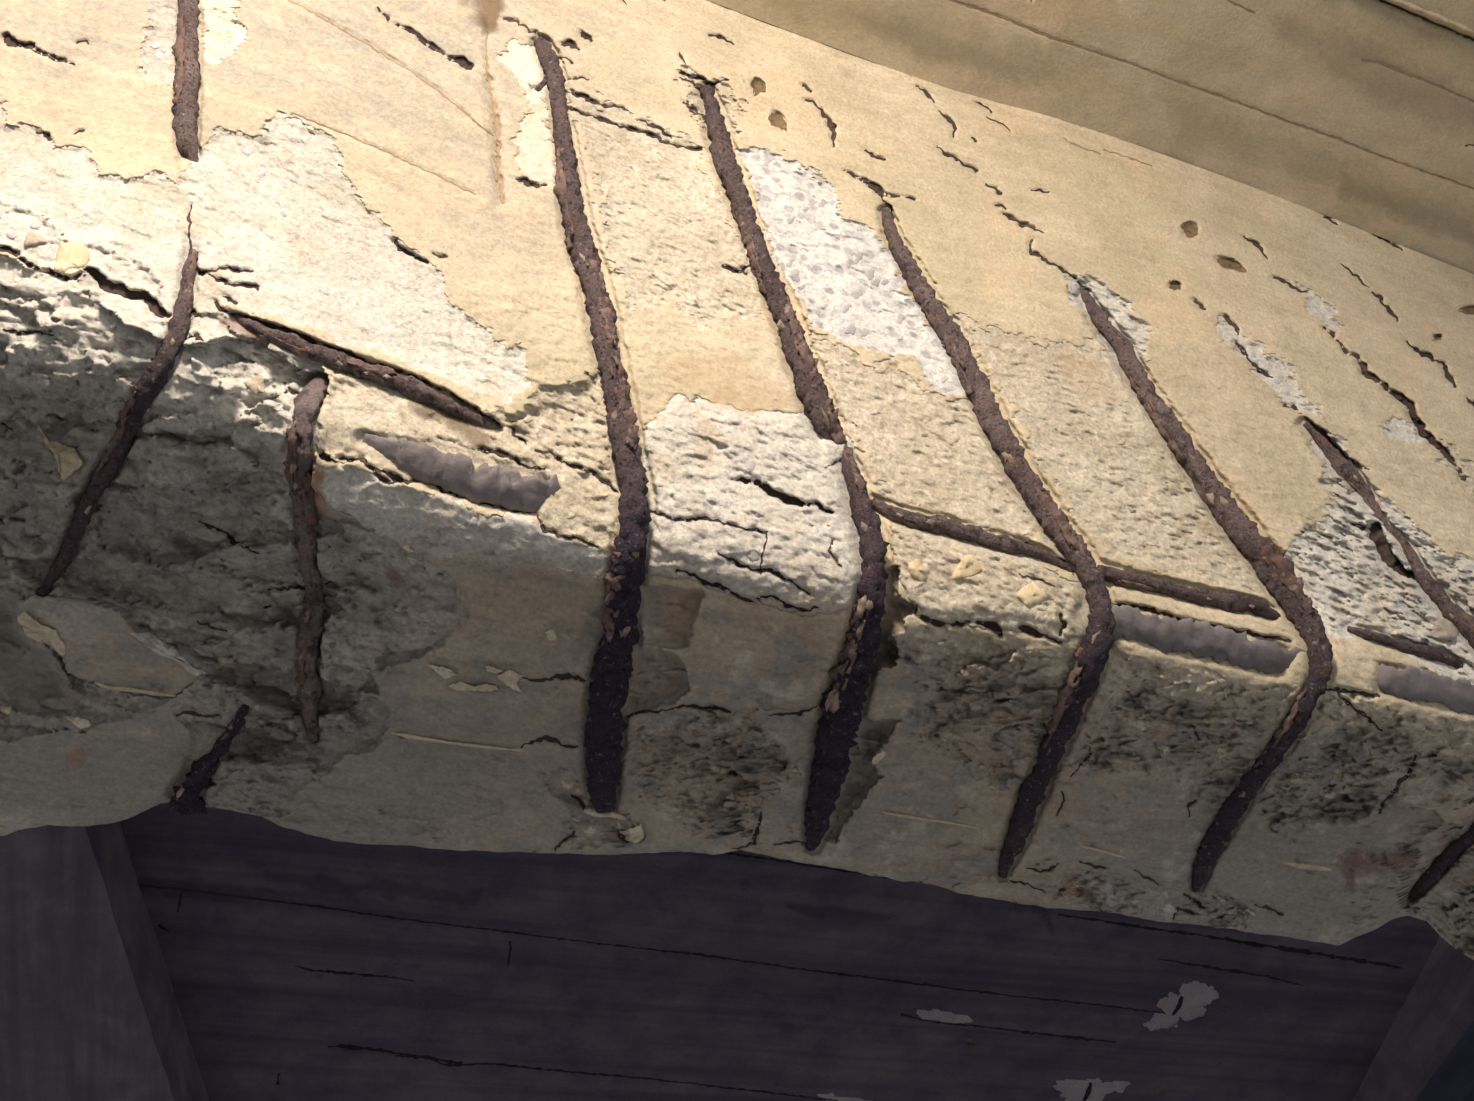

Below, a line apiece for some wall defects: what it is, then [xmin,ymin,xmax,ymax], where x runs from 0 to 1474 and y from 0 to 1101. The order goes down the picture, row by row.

leakage [478,0,502,32]
spalling [496,39,556,189]
crack [916,85,1088,290]
spalling [0,101,621,817]
crack [0,204,842,612]
rust [415,404,487,446]
spalling [565,65,1057,547]
crack [913,542,1074,644]
spalling [953,274,1266,596]
spalling [1215,315,1474,685]
crack [1352,523,1415,580]
crack [1323,326,1466,481]